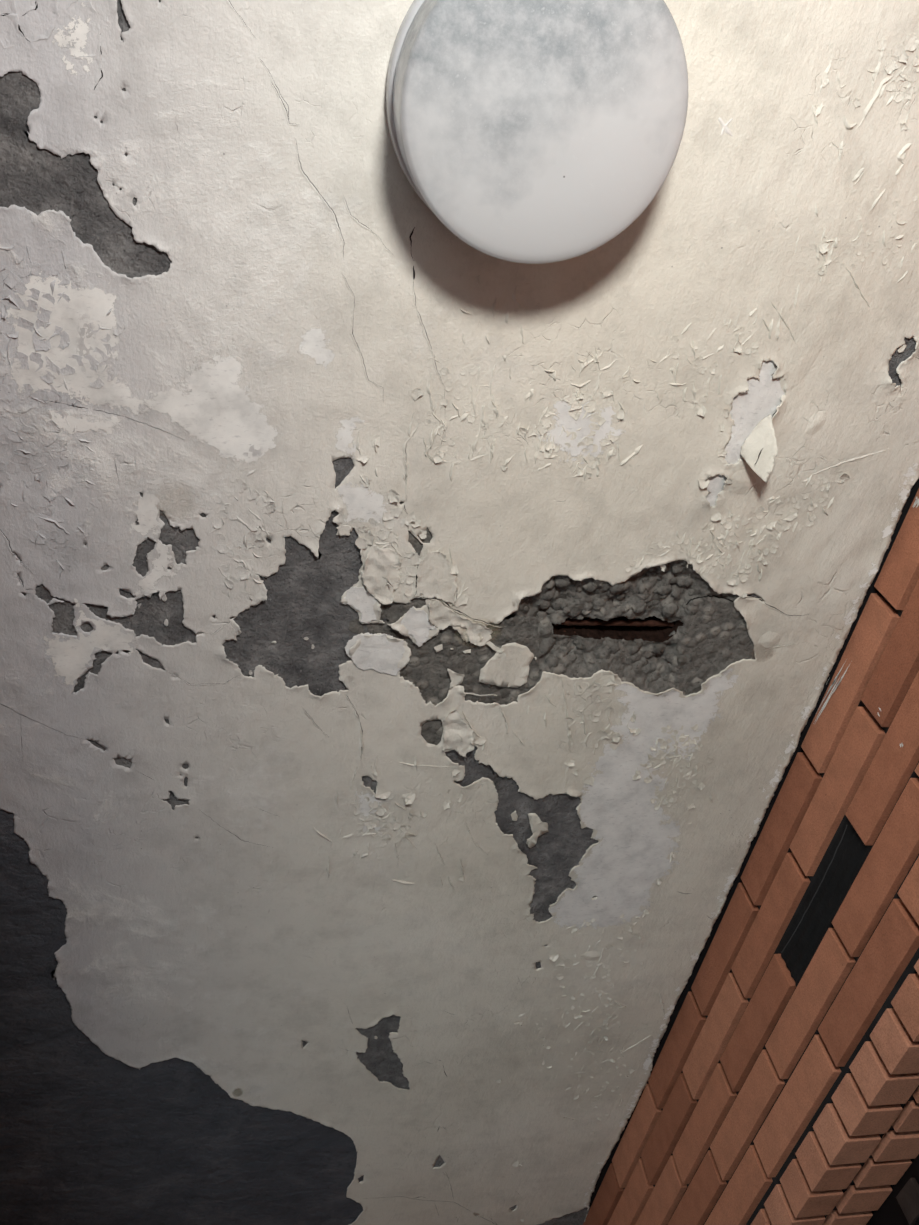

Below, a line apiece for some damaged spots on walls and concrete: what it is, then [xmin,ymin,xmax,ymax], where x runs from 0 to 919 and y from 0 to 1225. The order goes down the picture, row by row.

peeling [52,2,94,76]
peeling [117,0,130,42]
peeling [839,34,919,175]
crack [225,0,445,527]
peeling [795,189,919,307]
peeling [888,337,916,387]
spalling [0,71,886,930]
peeling [0,809,364,1225]
peeling [356,1015,410,1089]
peeling [538,1206,590,1225]